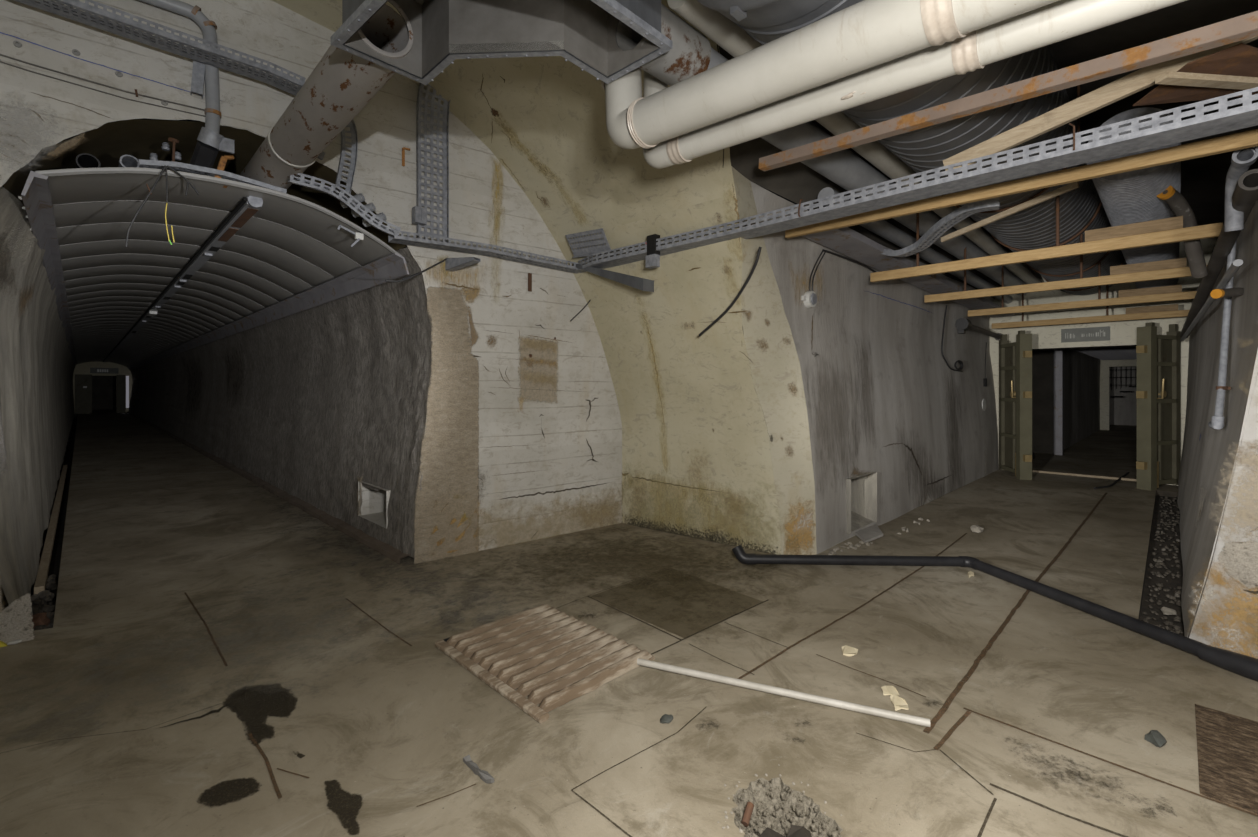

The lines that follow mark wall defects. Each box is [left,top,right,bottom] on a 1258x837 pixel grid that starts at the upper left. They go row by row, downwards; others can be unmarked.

peeling [414,287,479,564]
damp [498,503,815,613]
flaking render [0,586,35,644]
damp [1192,569,1258,658]
damp [160,683,298,745]
damp [198,778,259,807]
damp [325,780,363,835]
spalling [718,764,844,837]